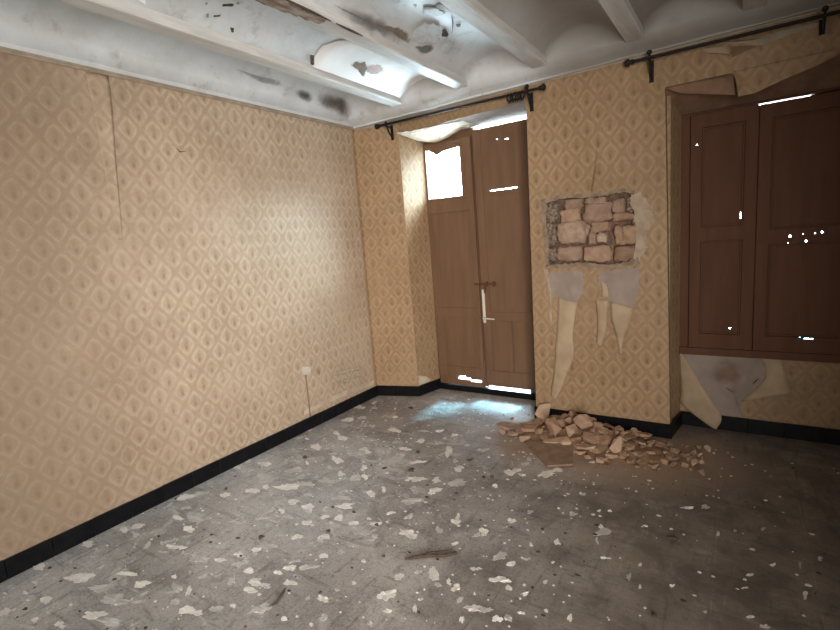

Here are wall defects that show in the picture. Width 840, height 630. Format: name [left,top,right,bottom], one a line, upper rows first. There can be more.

peeling [412,4,461,54]
peeling [712,23,819,57]
water stain [323,98,347,114]
flaking render [541,188,655,308]
flaking render [683,354,766,417]